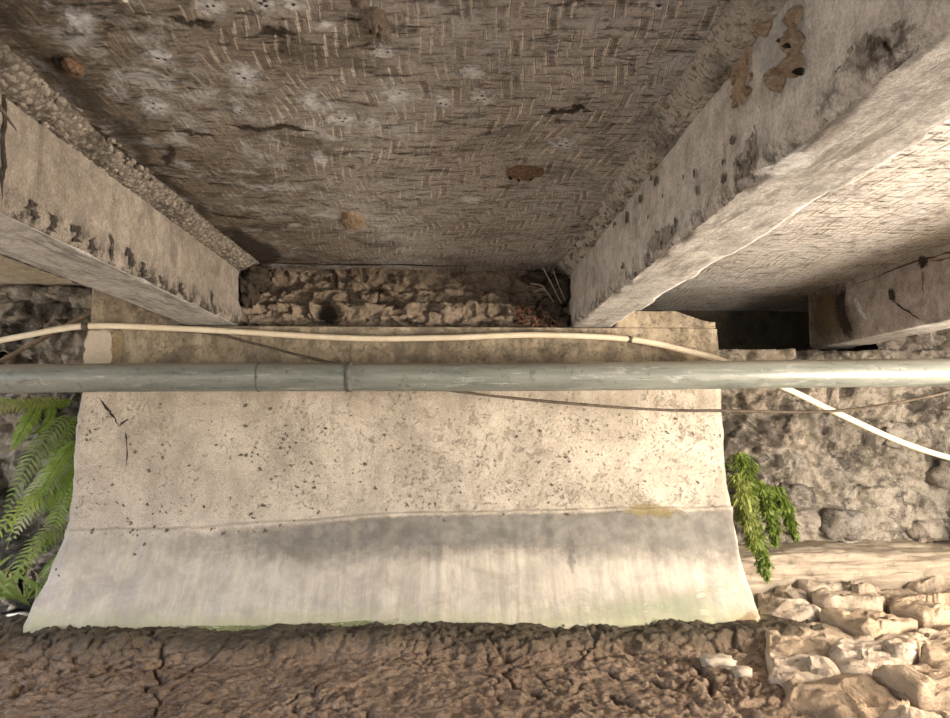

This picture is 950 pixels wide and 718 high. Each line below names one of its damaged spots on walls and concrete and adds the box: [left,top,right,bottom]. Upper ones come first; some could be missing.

corrosion [724,45,753,109]
crack [543,104,595,115]
crack [89,123,318,166]
leakage [126,247,147,277]
crack [101,400,128,465]
leakage [245,511,739,557]